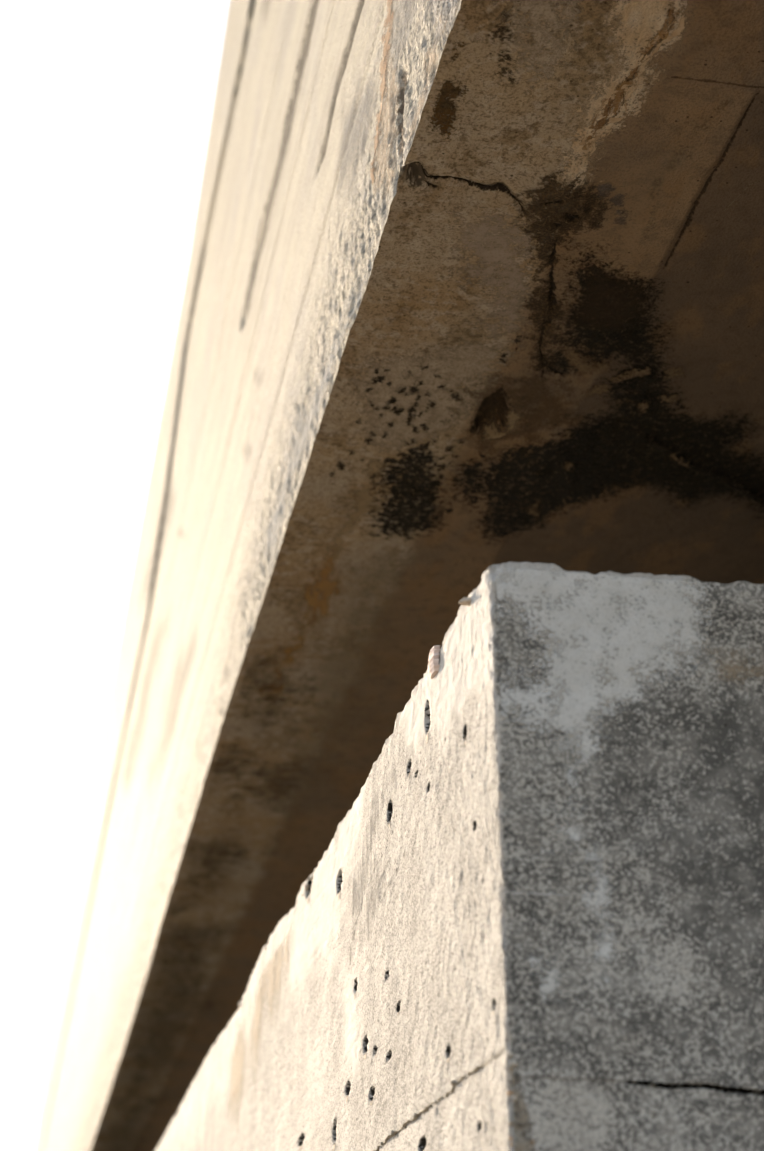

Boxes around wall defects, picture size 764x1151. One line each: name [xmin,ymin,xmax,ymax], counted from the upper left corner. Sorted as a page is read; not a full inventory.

crack [396,70,590,378]
leakage [329,0,764,558]
crack [517,1076,764,1095]